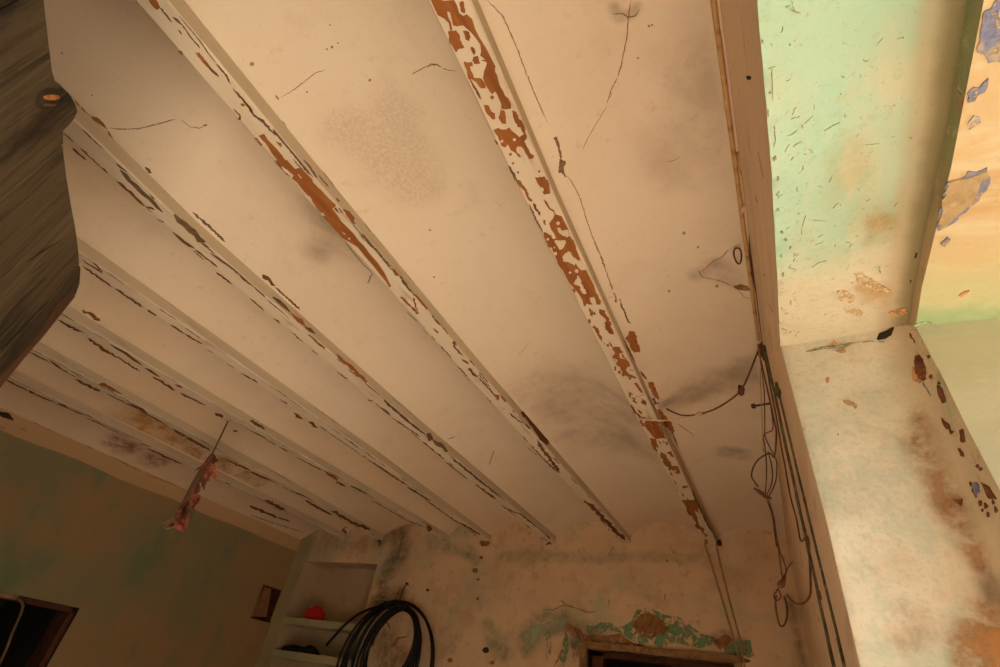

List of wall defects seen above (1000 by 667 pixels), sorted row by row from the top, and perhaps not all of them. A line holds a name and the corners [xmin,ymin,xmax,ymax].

crack [112,119,207,130]
crack [487,0,547,121]
crack [582,1,653,150]
peeling [116,0,560,473]
peeling [431,0,711,544]
crack [567,176,623,305]
peeling [936,167,991,247]
peeling [337,355,546,541]
spalling [912,355,946,404]
spalling [941,418,966,457]
spalling [953,464,998,517]
peeling [546,609,754,666]